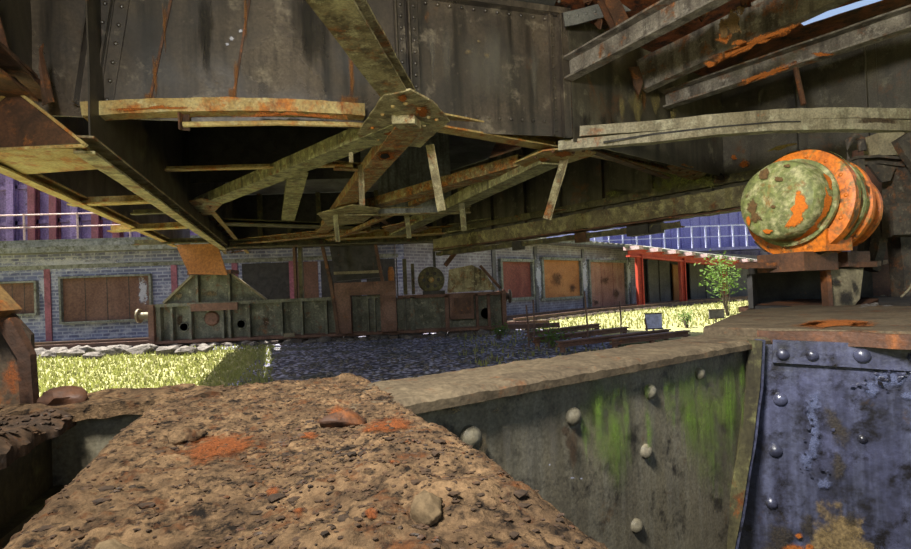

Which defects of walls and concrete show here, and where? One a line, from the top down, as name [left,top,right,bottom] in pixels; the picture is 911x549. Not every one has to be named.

rust [116,64,187,112]
rust [2,362,21,394]